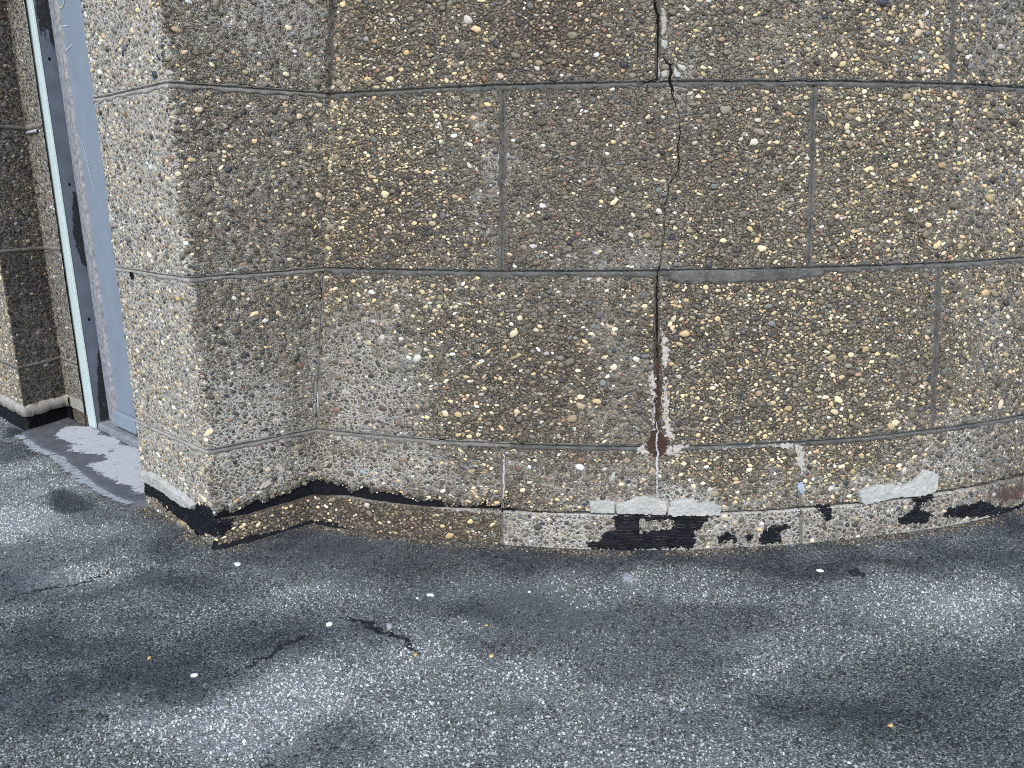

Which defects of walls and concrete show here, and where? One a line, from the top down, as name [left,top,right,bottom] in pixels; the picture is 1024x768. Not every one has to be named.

crack [636,0,681,382]
rust [645,329,670,499]
leakage [648,328,690,457]
leakage [704,442,805,494]
spalling [144,478,515,537]
peeling [587,514,709,550]
peeling [717,524,791,546]
peeling [816,502,833,521]
peeling [898,494,1024,526]